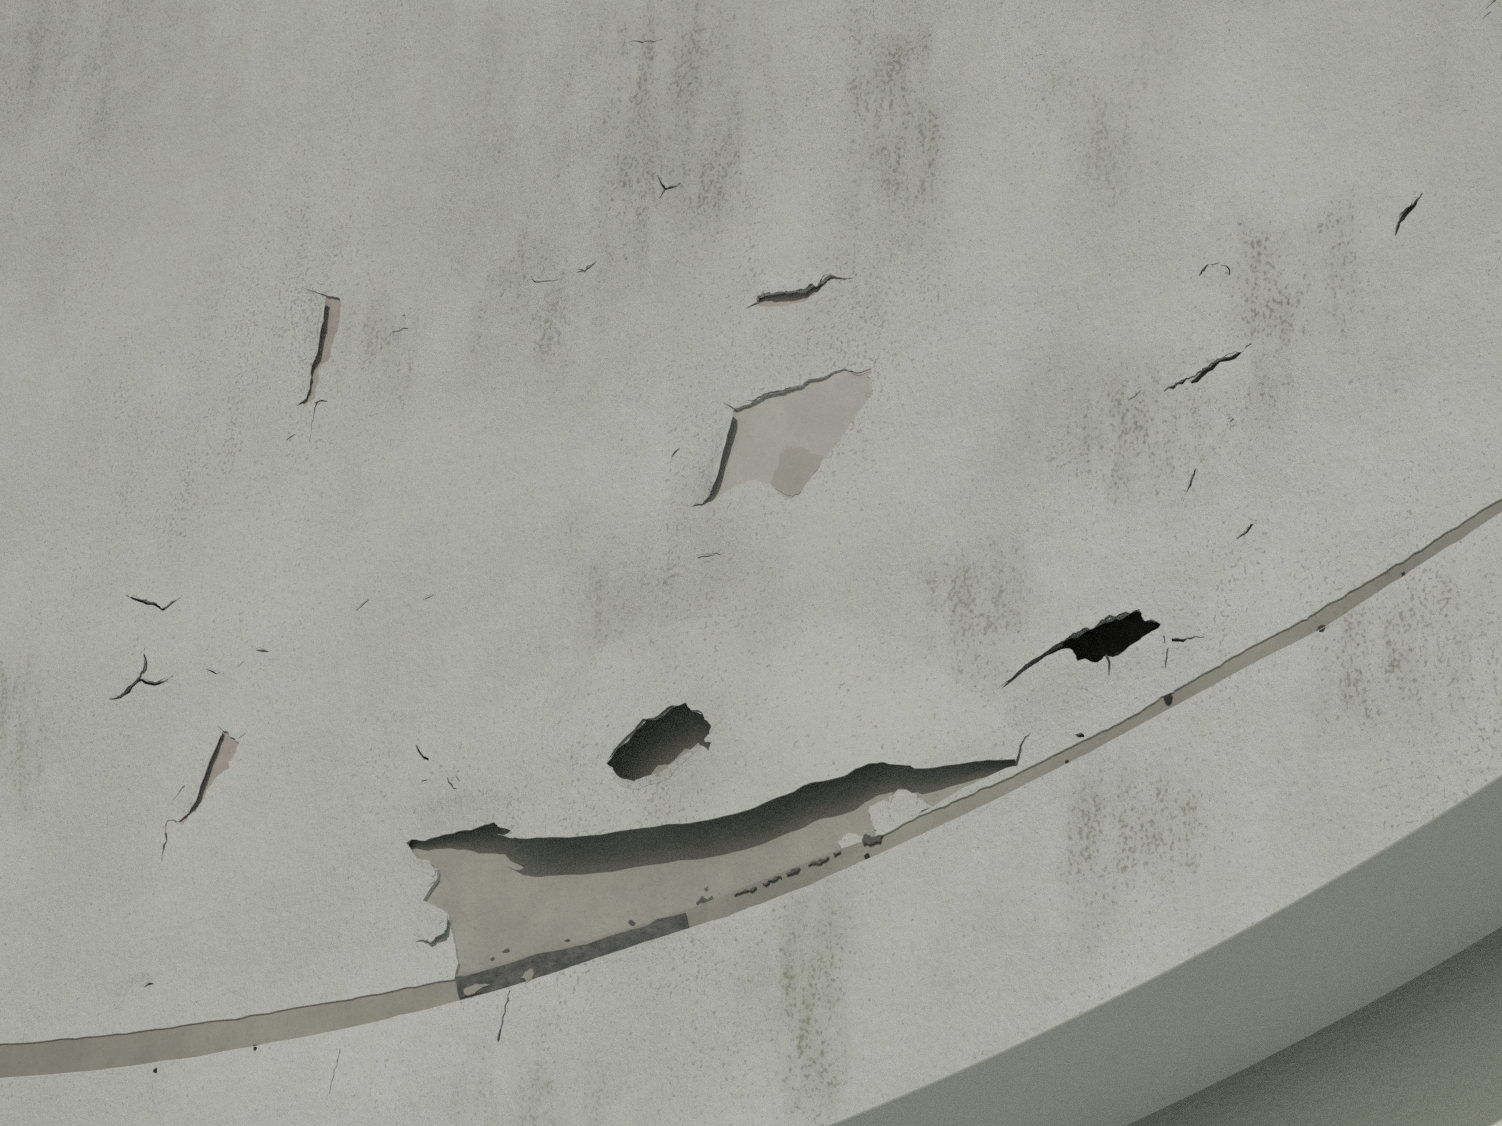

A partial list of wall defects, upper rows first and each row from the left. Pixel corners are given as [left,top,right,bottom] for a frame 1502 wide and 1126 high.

peeling [292,287,341,406]
crack [1163,339,1250,389]
peeling [689,369,873,507]
crack [109,648,173,700]
crack [127,583,180,611]
spalling [1026,612,1160,670]
peeling [164,724,239,849]
peeling [393,601,1032,999]